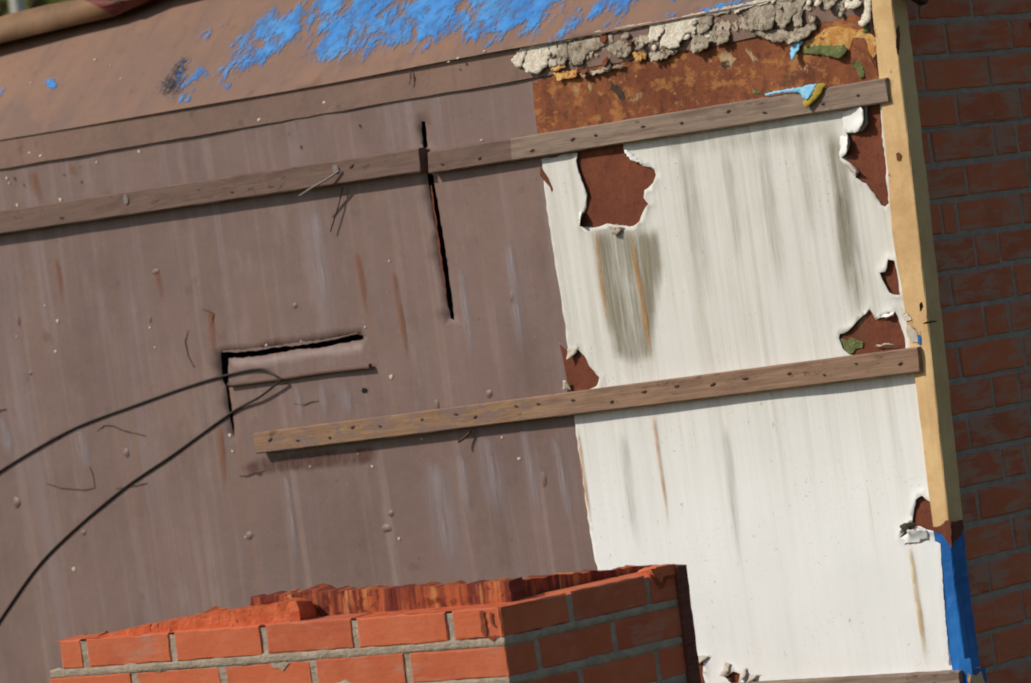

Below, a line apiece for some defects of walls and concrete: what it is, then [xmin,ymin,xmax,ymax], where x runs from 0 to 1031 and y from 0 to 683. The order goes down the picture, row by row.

peeling [176,0,877,102]
rust [532,15,879,134]
crack [422,121,454,320]
peeling [577,144,656,235]
peeling [839,104,901,206]
crack [185,309,214,367]
crack [222,333,357,435]
peeling [560,345,599,392]
water stain [597,235,659,357]
peeling [839,260,923,355]
peeling [899,496,987,683]
peeling [719,662,759,683]